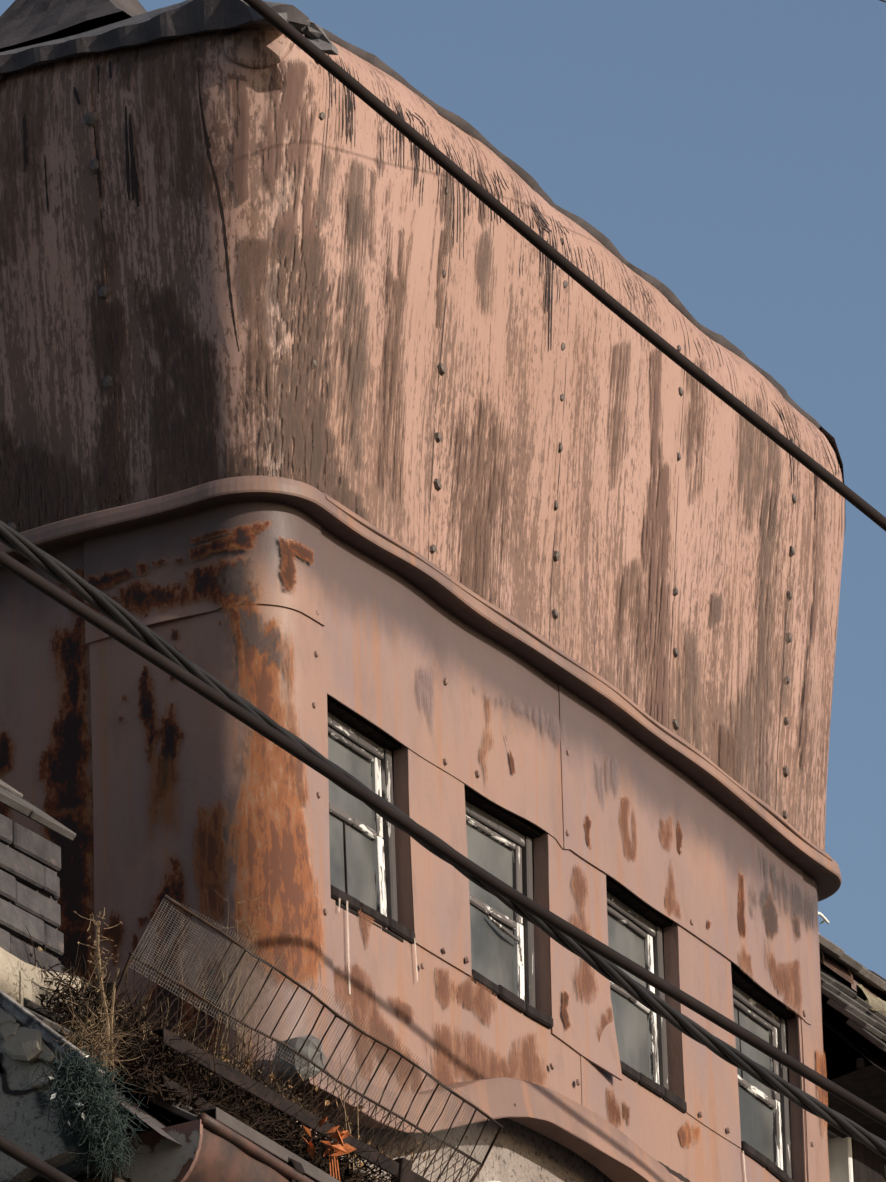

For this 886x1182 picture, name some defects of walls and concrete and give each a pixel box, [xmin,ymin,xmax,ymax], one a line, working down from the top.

water stain [0,219,127,532]
crack [197,61,239,352]
water stain [106,29,408,526]
water stain [437,170,453,328]
corrosion [73,521,299,737]
corrosion [279,538,314,591]
water stain [619,349,723,752]
water stain [717,390,794,805]
corrosion [38,582,422,1091]
corrosion [738,874,753,975]
peeling [117,1129,200,1182]
corrosion [816,1050,828,1106]